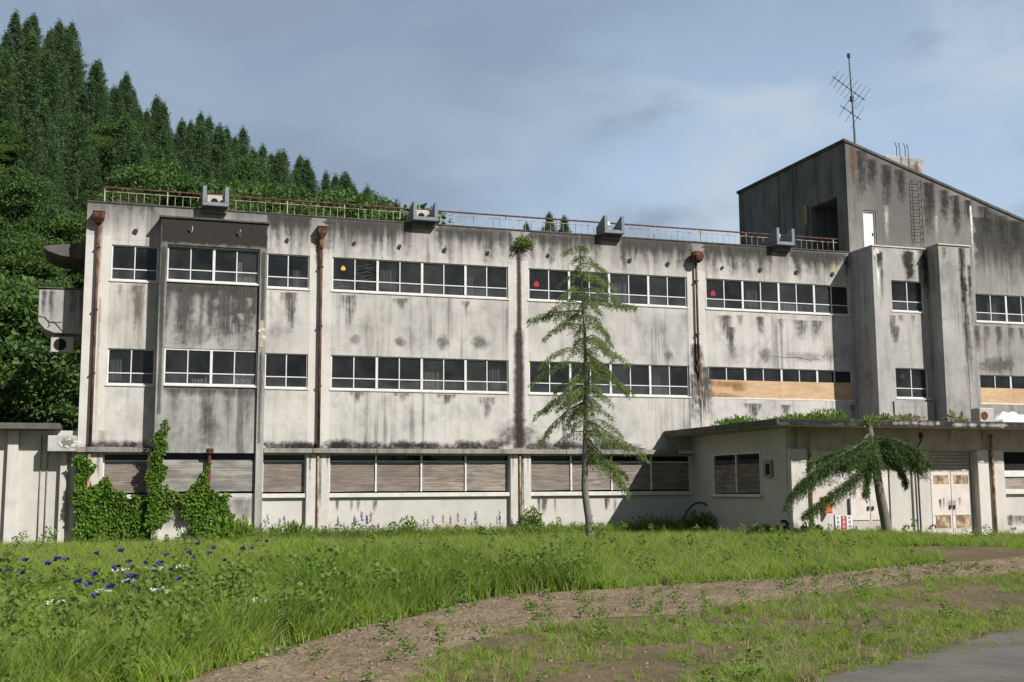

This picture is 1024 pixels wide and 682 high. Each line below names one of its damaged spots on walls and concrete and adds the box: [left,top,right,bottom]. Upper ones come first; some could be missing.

water stain [857,151,904,197]
crack [39,316,63,332]
water stain [157,214,312,428]
water stain [264,226,601,504]